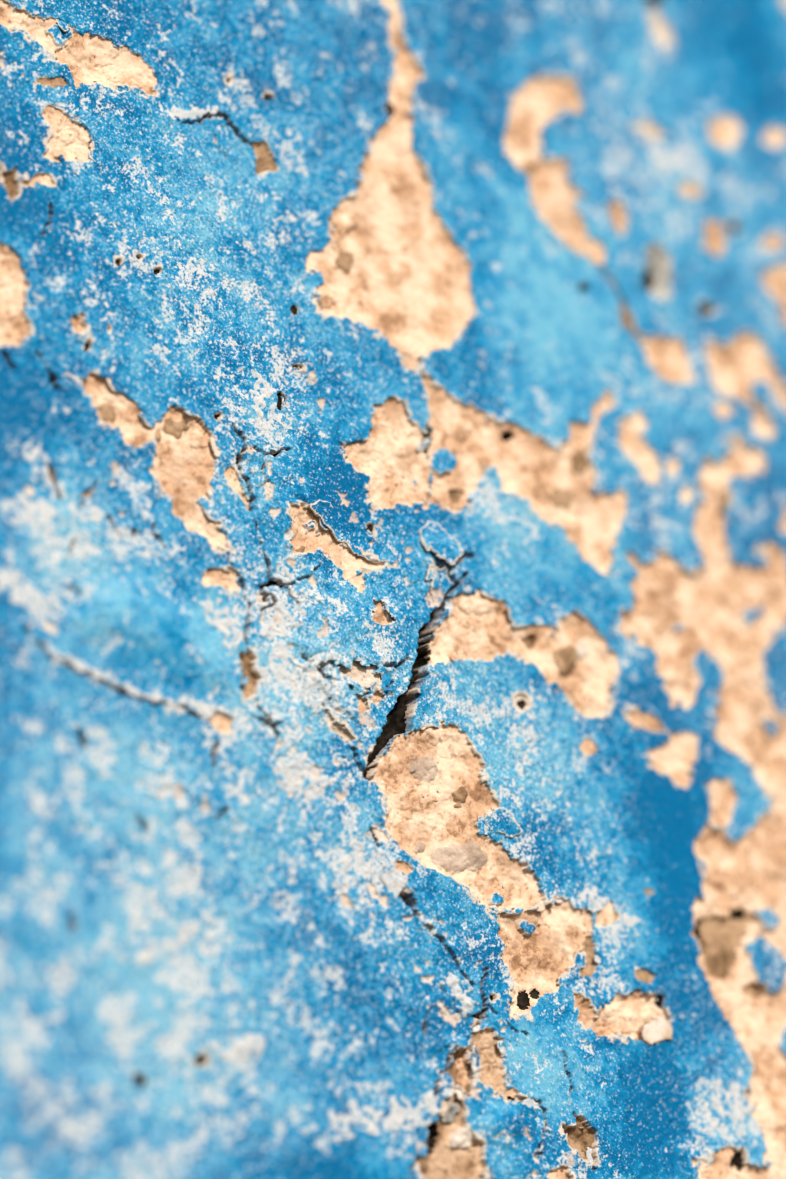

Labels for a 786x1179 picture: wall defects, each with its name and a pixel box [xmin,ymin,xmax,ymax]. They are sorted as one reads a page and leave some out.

peeling [0,0,157,96]
peeling [305,0,626,575]
peeling [503,77,694,385]
peeling [62,374,226,550]
crack [224,435,278,511]
peeling [284,499,383,593]
crack [361,521,468,780]
peeling [420,589,617,718]
peeling [618,334,786,1179]
peeling [367,722,617,1016]
crack [439,972,482,1034]
peeling [573,969,673,1045]